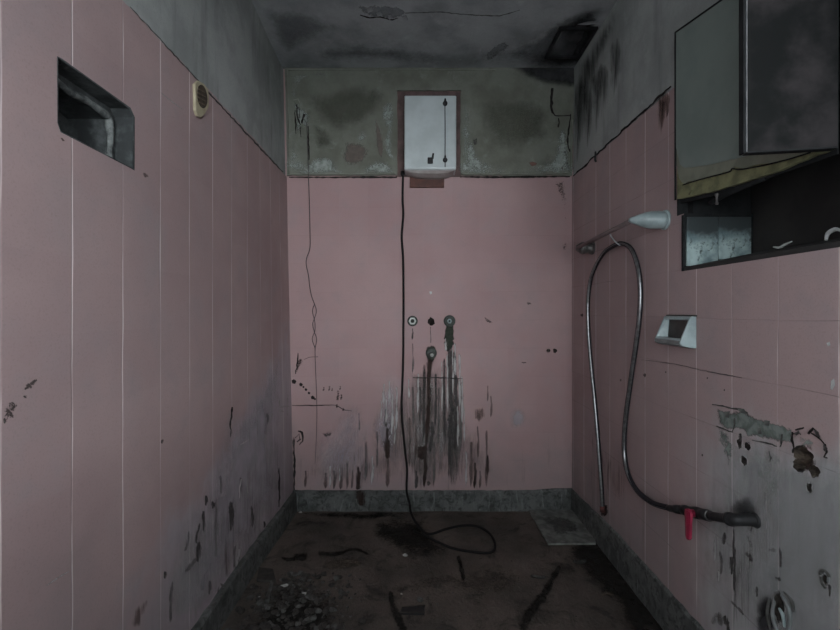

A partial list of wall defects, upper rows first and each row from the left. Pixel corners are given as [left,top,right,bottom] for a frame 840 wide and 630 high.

crack [411,9,519,17]
crack [460,86,671,178]
water stain [289,155,334,172]
water stain [408,326,492,488]
spalling [712,404,828,462]
water stain [714,530,736,590]
spalling [758,591,795,630]